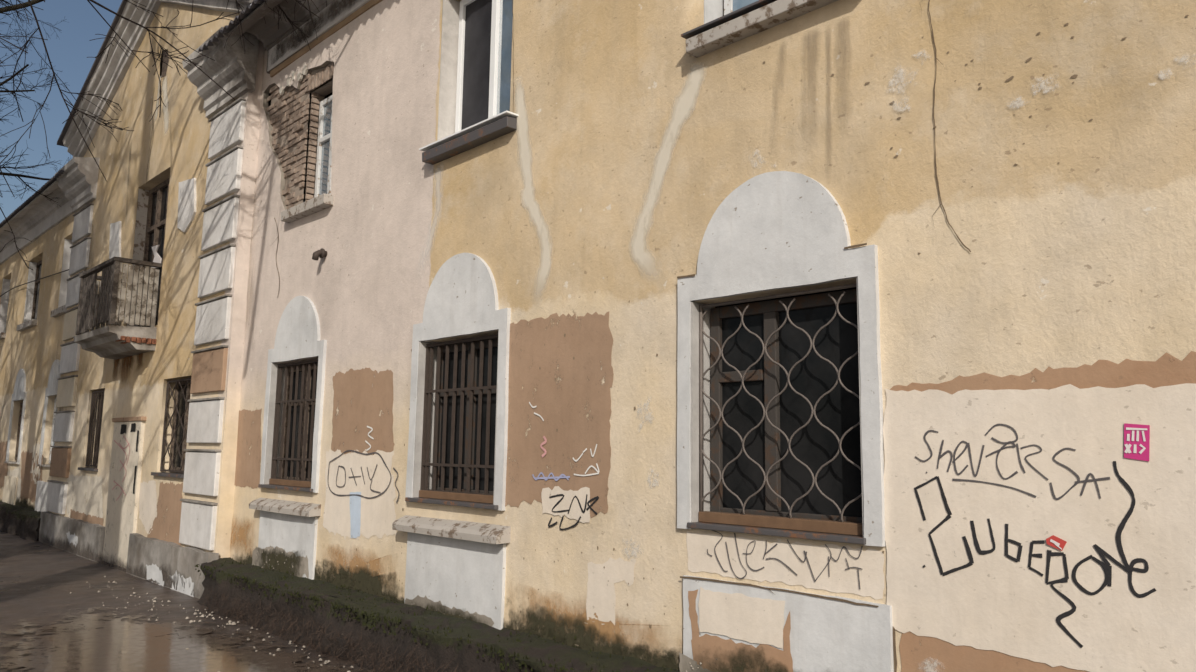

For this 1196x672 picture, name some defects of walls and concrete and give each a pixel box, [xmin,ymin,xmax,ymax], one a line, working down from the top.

damp [276,0,355,58]
spalling [263,61,334,210]
crack [920,0,971,252]